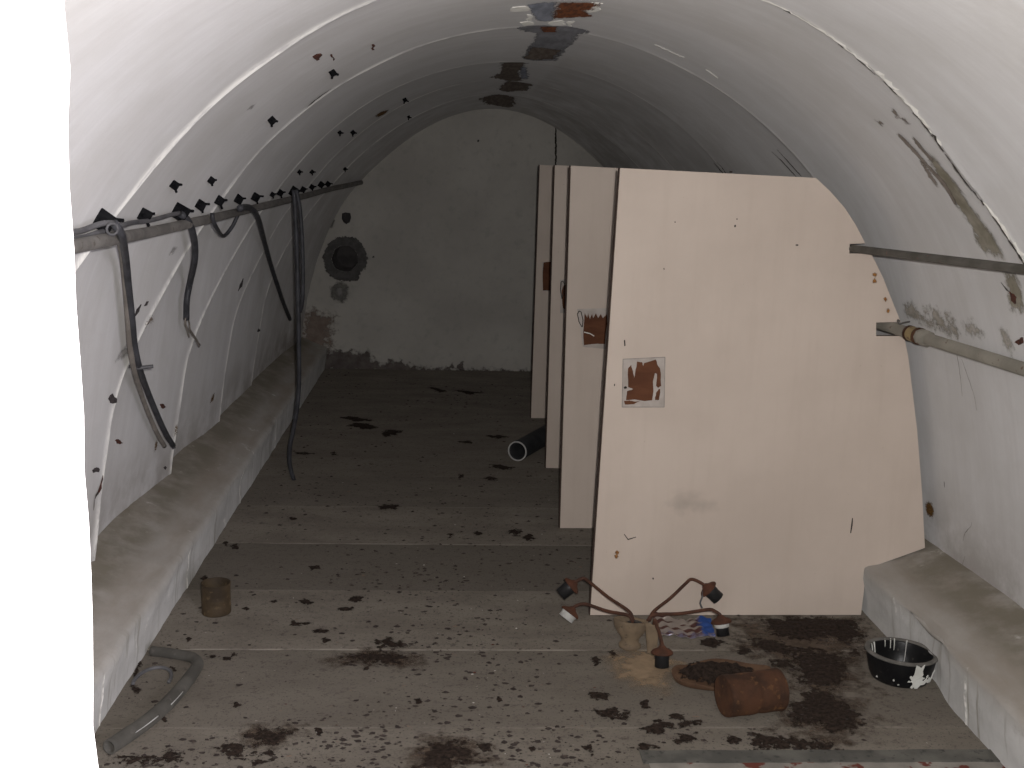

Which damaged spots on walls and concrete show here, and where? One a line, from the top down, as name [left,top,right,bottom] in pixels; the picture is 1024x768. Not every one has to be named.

rust [510,2,603,27]
water stain [302,310,532,372]